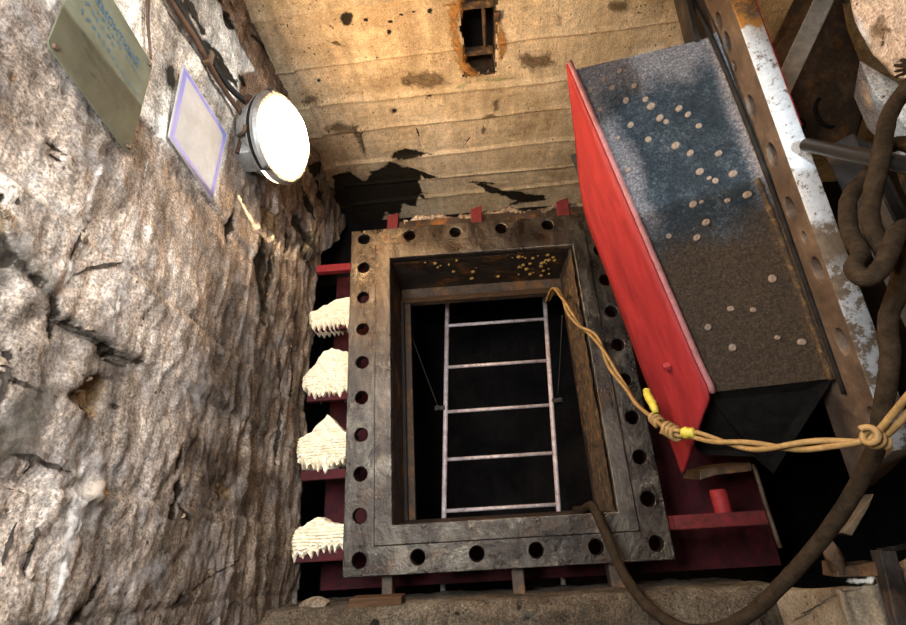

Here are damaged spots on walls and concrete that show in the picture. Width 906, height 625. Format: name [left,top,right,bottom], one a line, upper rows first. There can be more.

corrosion [444,0,489,77]
corrosion [497,21,506,59]
leakage [403,71,444,88]
leakage [521,53,553,70]
crack [0,208,143,373]
crack [0,366,57,402]
crack [7,453,73,493]